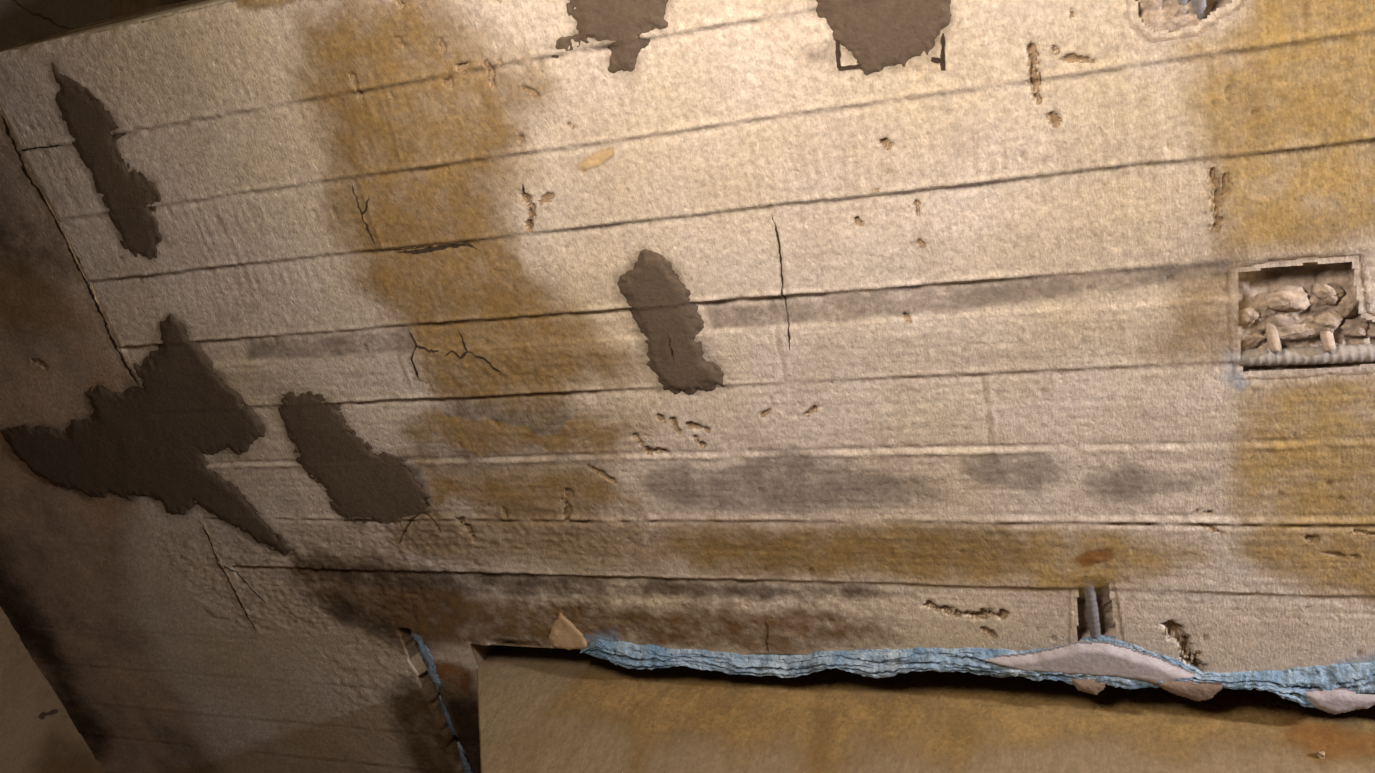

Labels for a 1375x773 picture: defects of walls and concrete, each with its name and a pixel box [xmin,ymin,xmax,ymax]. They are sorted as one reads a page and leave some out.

spalling [1125,0,1246,43]
water stain [1204,0,1375,244]
water stain [308,0,620,458]
water stain [710,301,816,327]
water stain [948,279,1082,309]
water stain [1127,266,1188,285]
spalling [1226,253,1375,380]
water stain [415,463,617,514]
water stain [650,456,918,508]
water stain [1239,383,1375,598]
water stain [658,527,1167,588]
spalling [1069,580,1126,643]